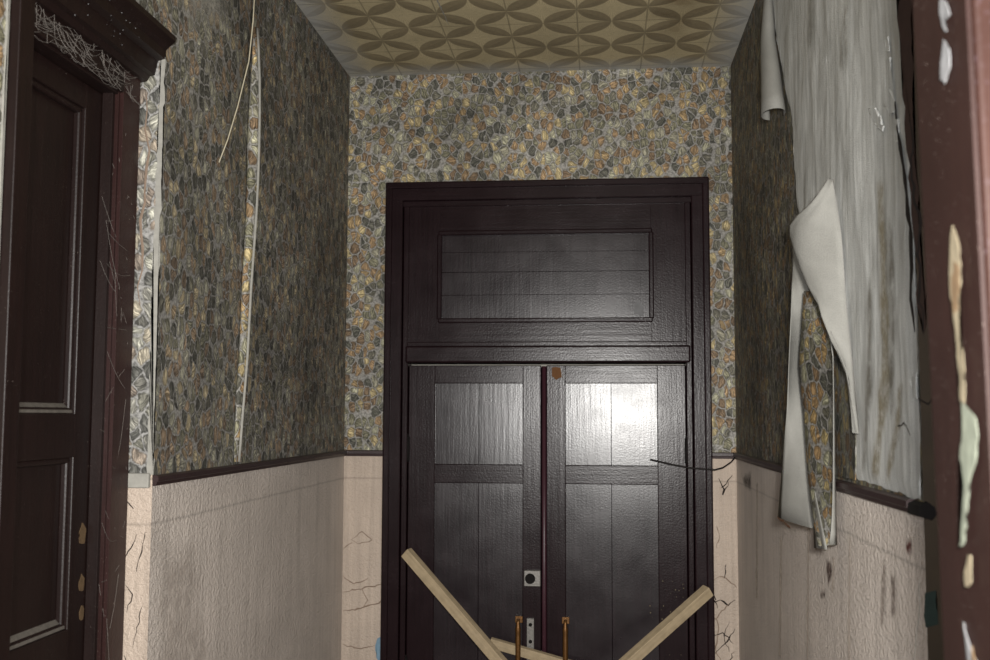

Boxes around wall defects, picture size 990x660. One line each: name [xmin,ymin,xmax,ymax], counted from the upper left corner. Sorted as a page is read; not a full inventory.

spalling [939,0,951,83]
peeling [773,0,921,500]
spalling [949,225,978,587]
crack [343,576,381,611]
crack [714,528,737,660]
peeling [924,590,939,628]
spalling [964,624,976,660]